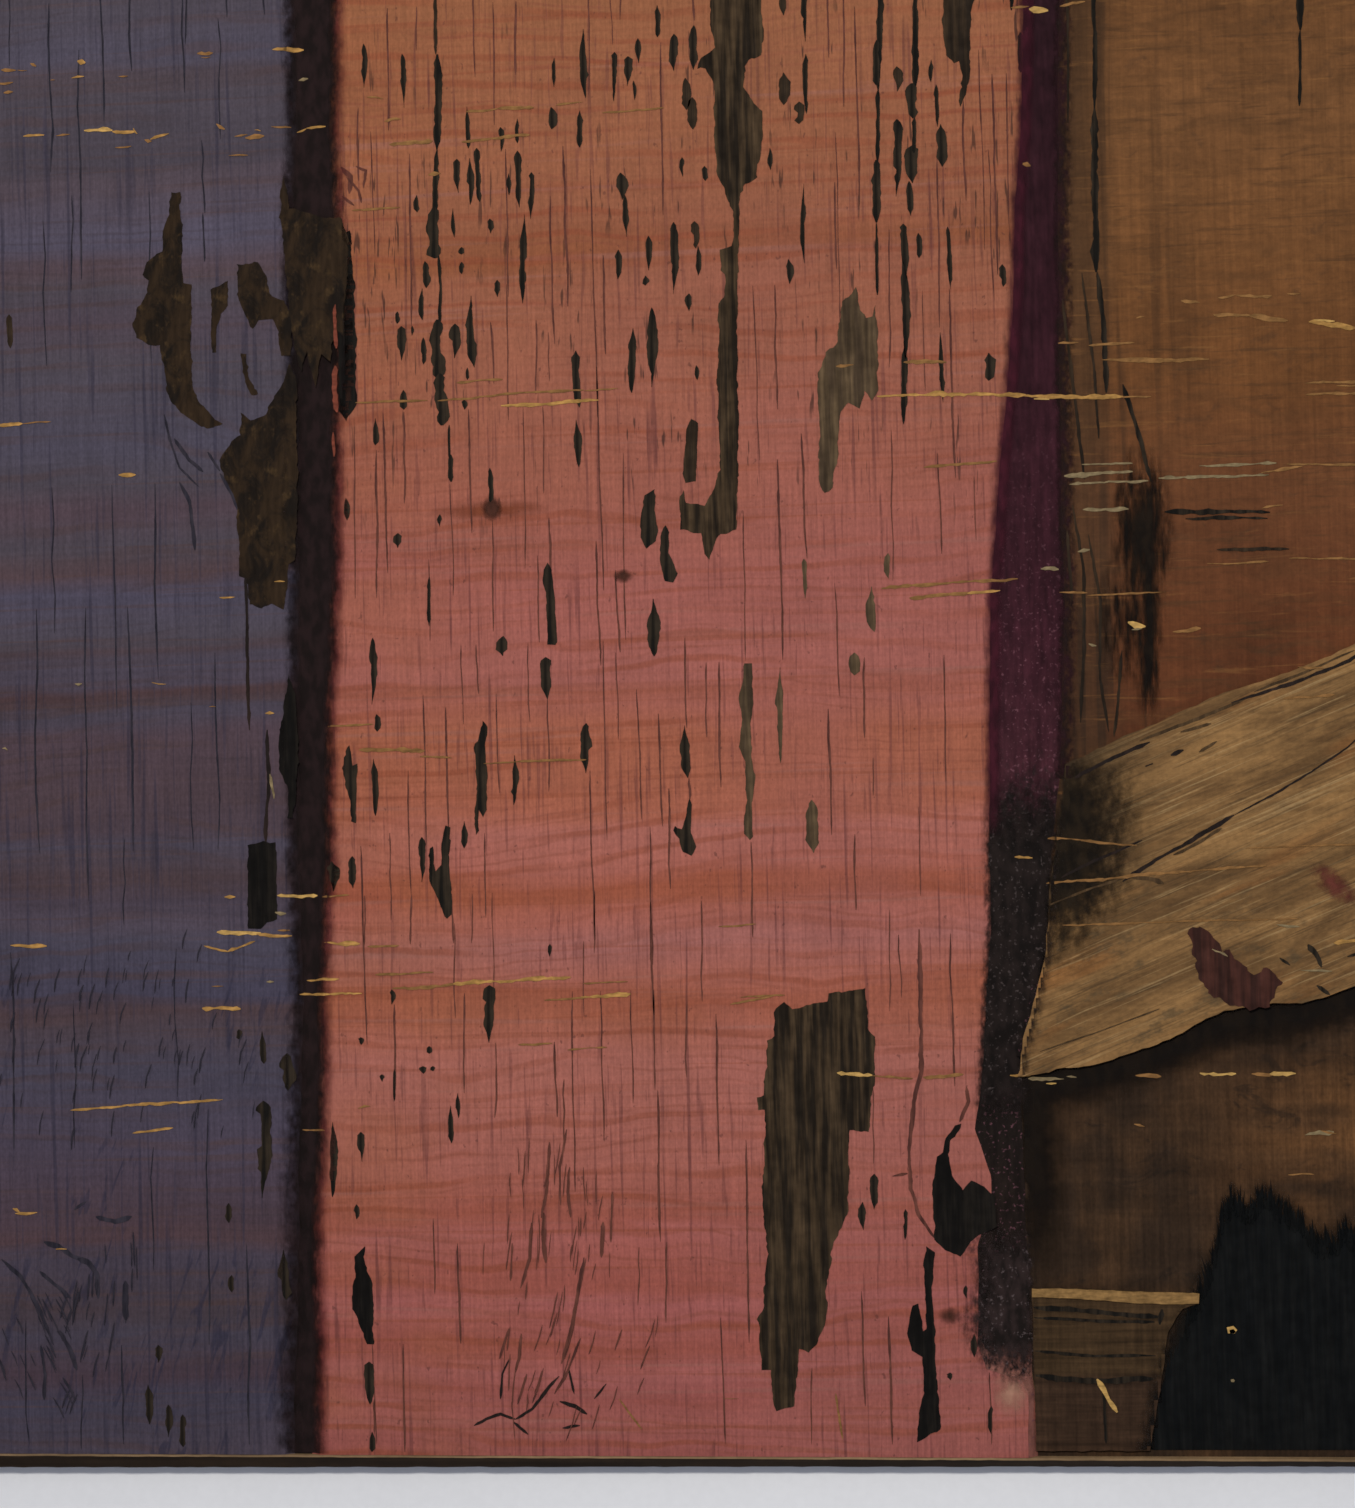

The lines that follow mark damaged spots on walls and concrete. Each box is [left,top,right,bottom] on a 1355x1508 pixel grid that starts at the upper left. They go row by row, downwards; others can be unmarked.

peeling [779,0,808,124]
peeling [928,0,974,167]
peeling [132,192,222,428]
peeling [211,175,357,609]
peeling [611,0,773,582]
peeling [817,288,879,493]
peeling [893,119,923,424]
peeling [247,841,278,929]
peeling [418,722,488,918]
peeling [352,1247,374,1344]
peeling [757,988,879,1411]
peeling [907,1124,997,1442]